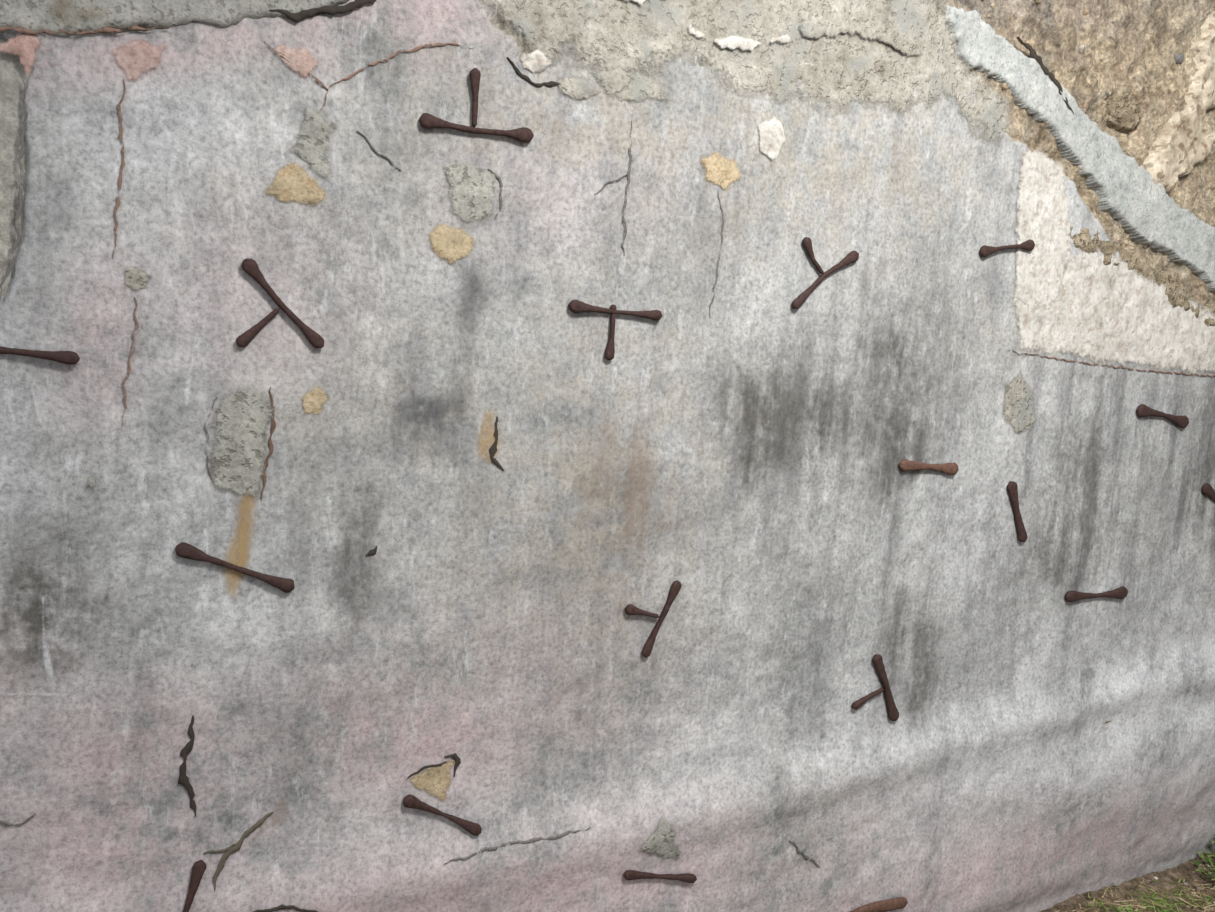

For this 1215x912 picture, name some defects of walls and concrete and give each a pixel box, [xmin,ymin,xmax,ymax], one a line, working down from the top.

flaking render [478,0,1010,160]
flaking render [0,38,29,301]
crack [178,715,197,817]
crack [203,811,273,891]
crack [444,827,590,864]
crack [253,904,318,912]